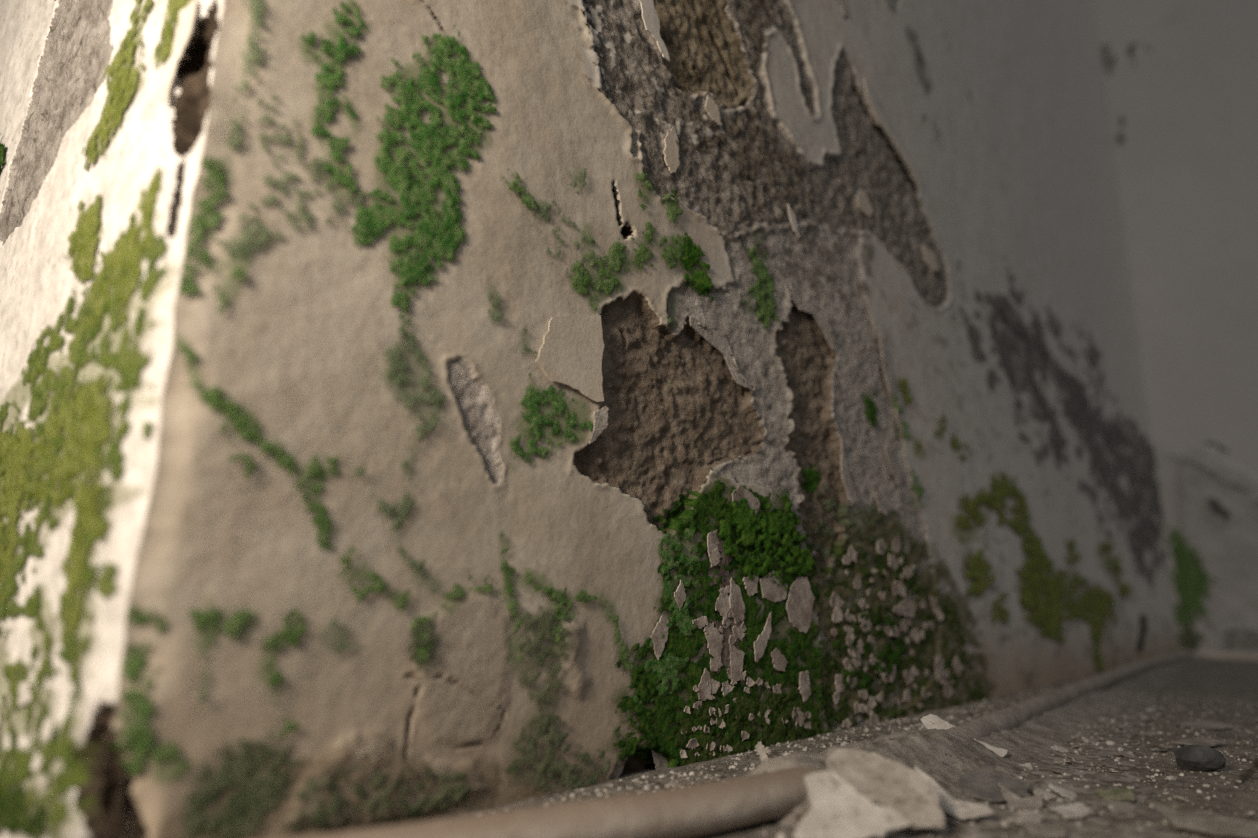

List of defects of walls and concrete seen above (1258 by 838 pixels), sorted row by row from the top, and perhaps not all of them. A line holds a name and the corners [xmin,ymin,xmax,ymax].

peeling [0,0,114,245]
crack [161,0,220,238]
crack [852,78,922,194]
peeling [535,0,955,732]
damp [953,256,1168,595]
peeling [974,738,1008,757]